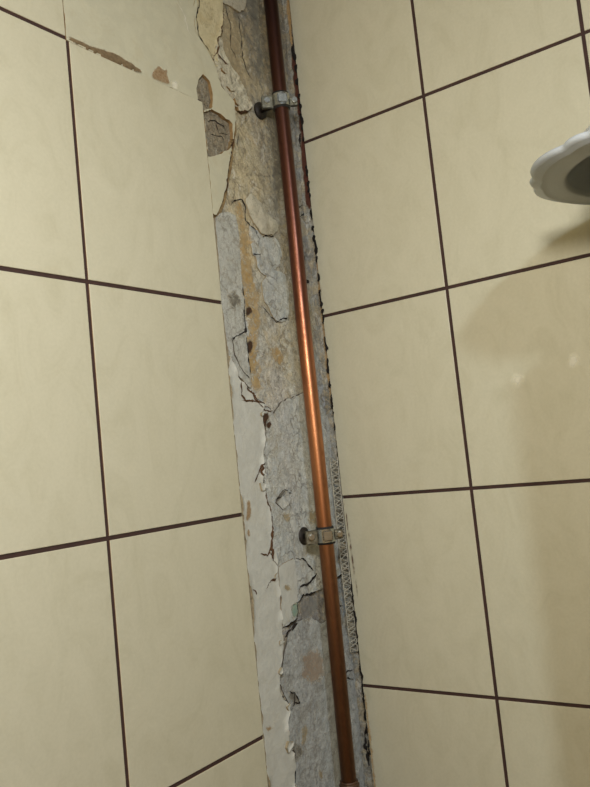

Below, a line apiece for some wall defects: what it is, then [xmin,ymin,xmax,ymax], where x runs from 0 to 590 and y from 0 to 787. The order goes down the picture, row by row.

crack [196,0,252,90]
crack [289,3,305,147]
crack [208,110,274,255]
peeling [63,0,341,787]
crack [232,285,287,412]
crack [299,165,339,465]
crack [254,434,291,594]
crack [284,558,317,637]
peeling [342,625,364,787]
crack [337,573,372,771]